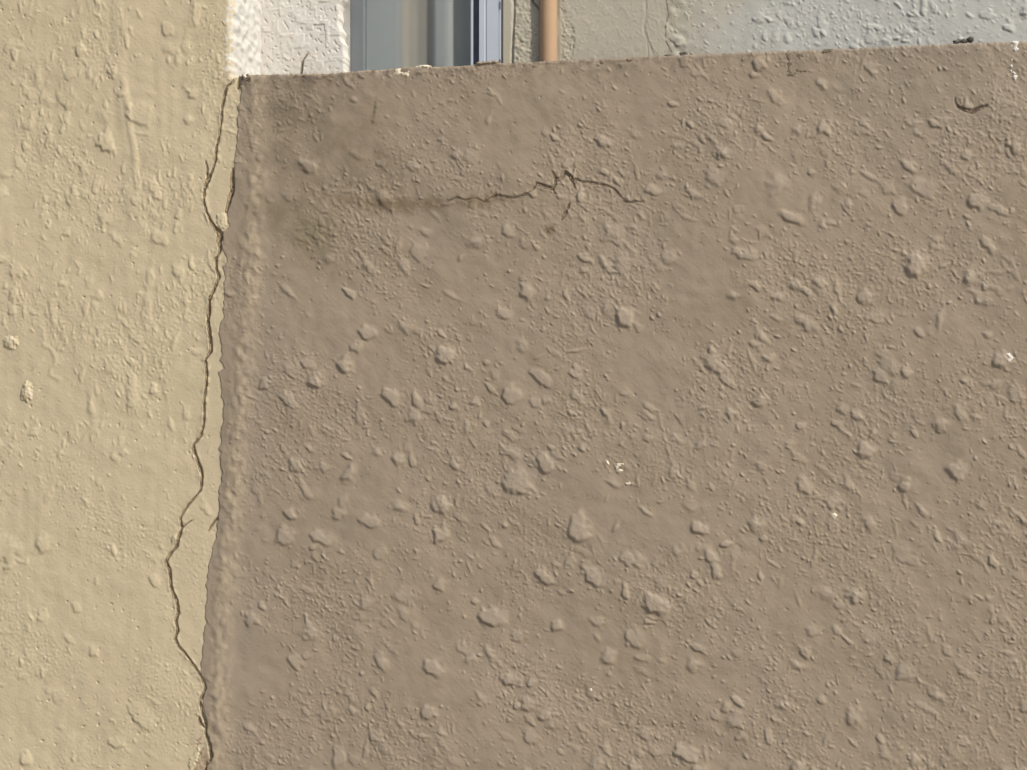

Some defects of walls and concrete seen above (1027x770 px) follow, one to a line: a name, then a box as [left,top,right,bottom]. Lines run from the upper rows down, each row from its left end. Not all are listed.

crack [165,76,240,770]
crack [445,168,643,219]